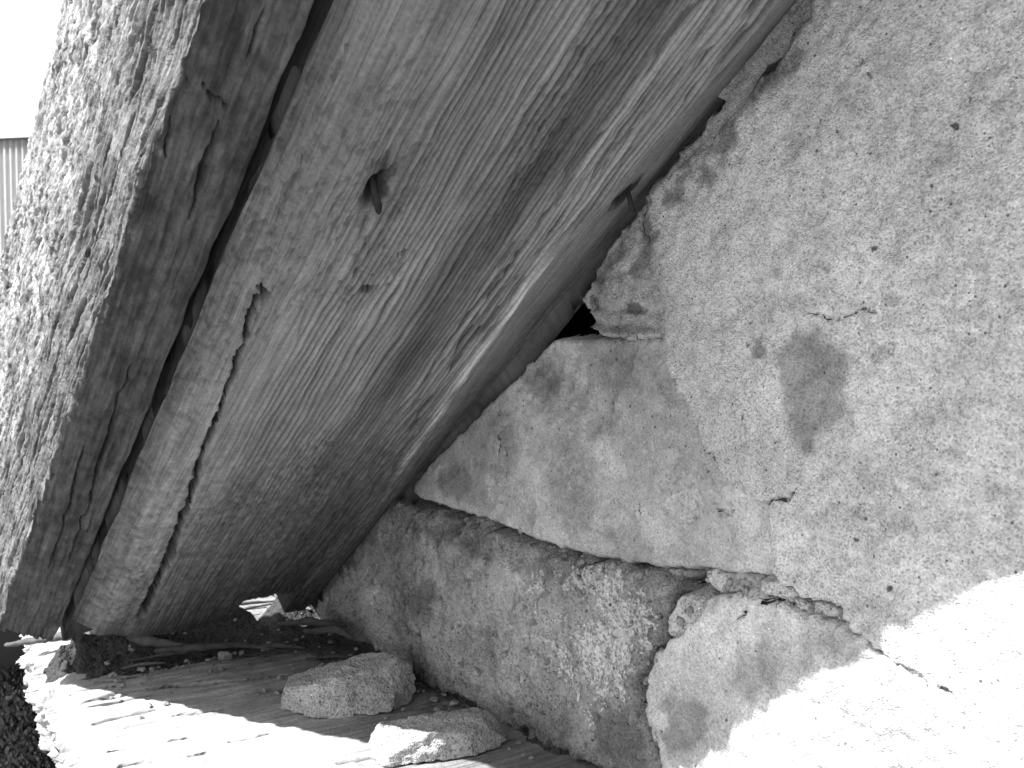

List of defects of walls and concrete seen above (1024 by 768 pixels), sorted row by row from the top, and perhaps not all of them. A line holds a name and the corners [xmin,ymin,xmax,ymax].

crack [737,596,830,620]